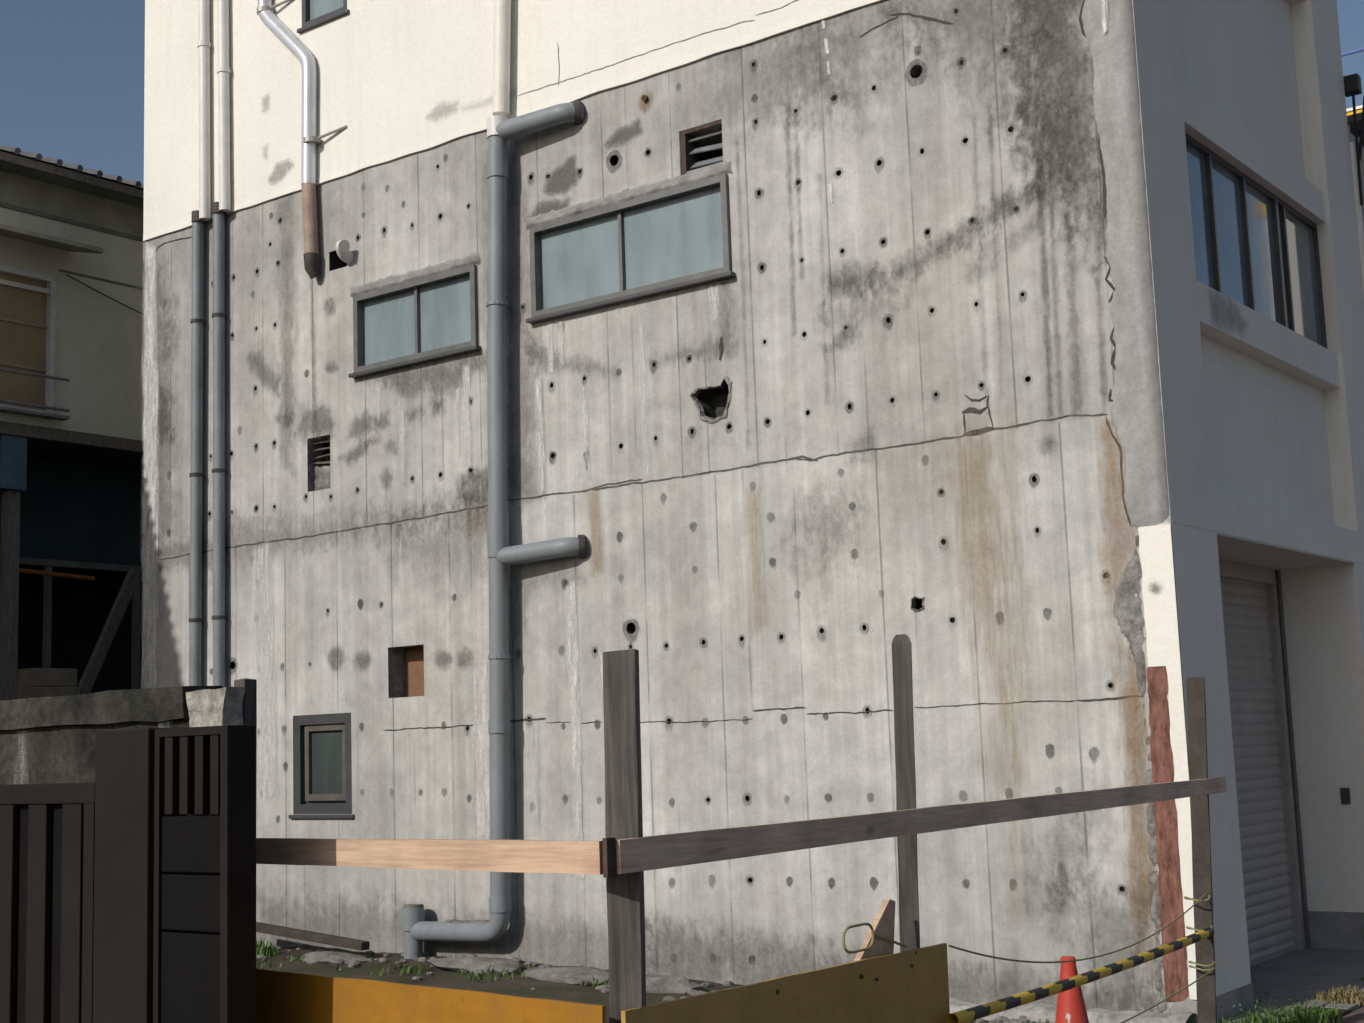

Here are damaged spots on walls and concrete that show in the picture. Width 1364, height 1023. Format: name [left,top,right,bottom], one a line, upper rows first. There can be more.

crack [517,0,797,96]
crack [859,13,953,38]
water stain [998,0,1104,234]
peeling [1098,139,1107,218]
water stain [832,266,904,289]
peeling [1104,256,1115,302]
water stain [397,358,488,501]
crack [155,395,1108,560]
spalling [690,376,733,424]
spalling [1106,417,1174,784]
peeling [1147,799,1189,1013]